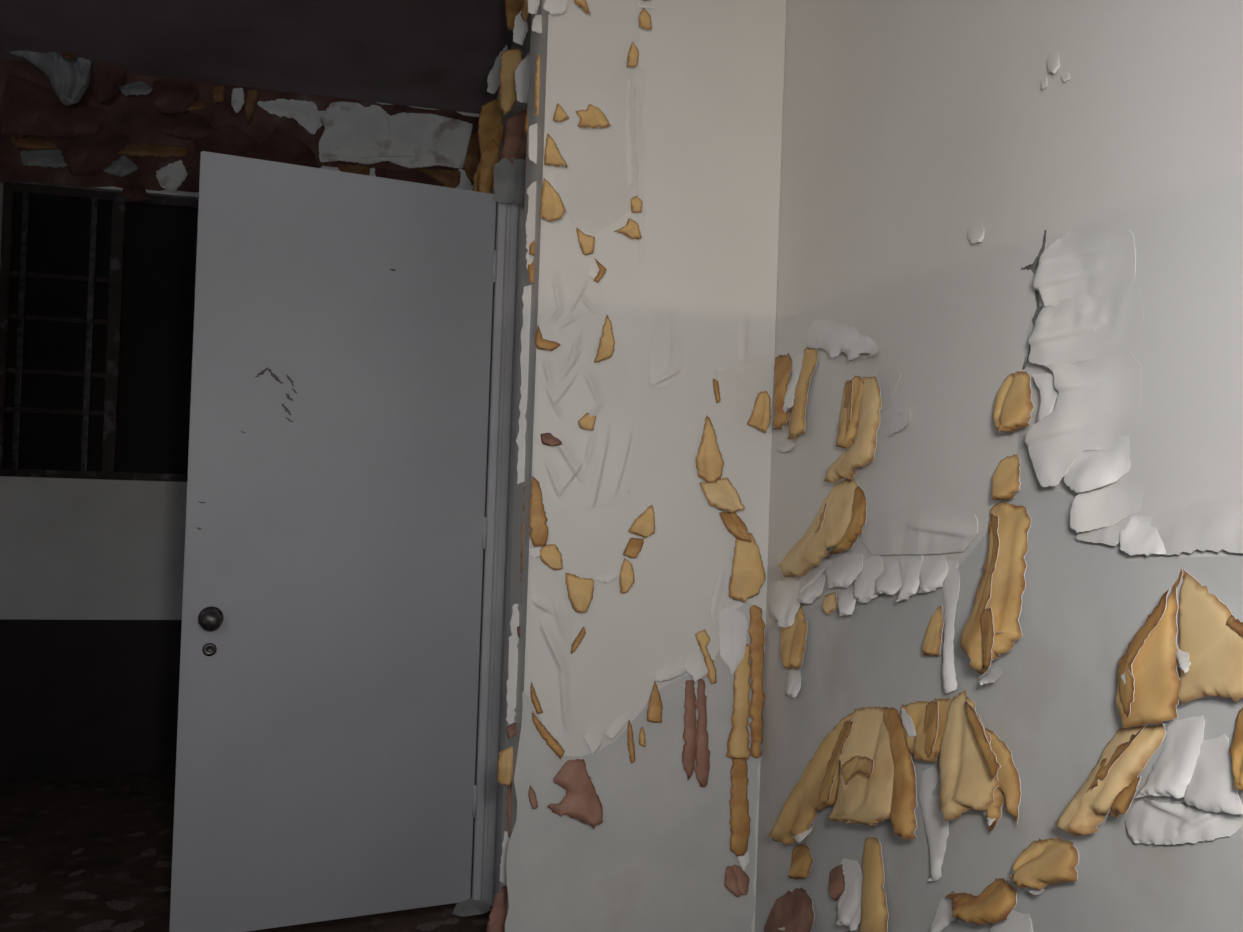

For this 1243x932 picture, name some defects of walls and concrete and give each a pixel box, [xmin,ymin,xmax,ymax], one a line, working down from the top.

peeling [0,0,655,613]
peeling [486,221,1243,932]
crack [1021,230,1047,370]